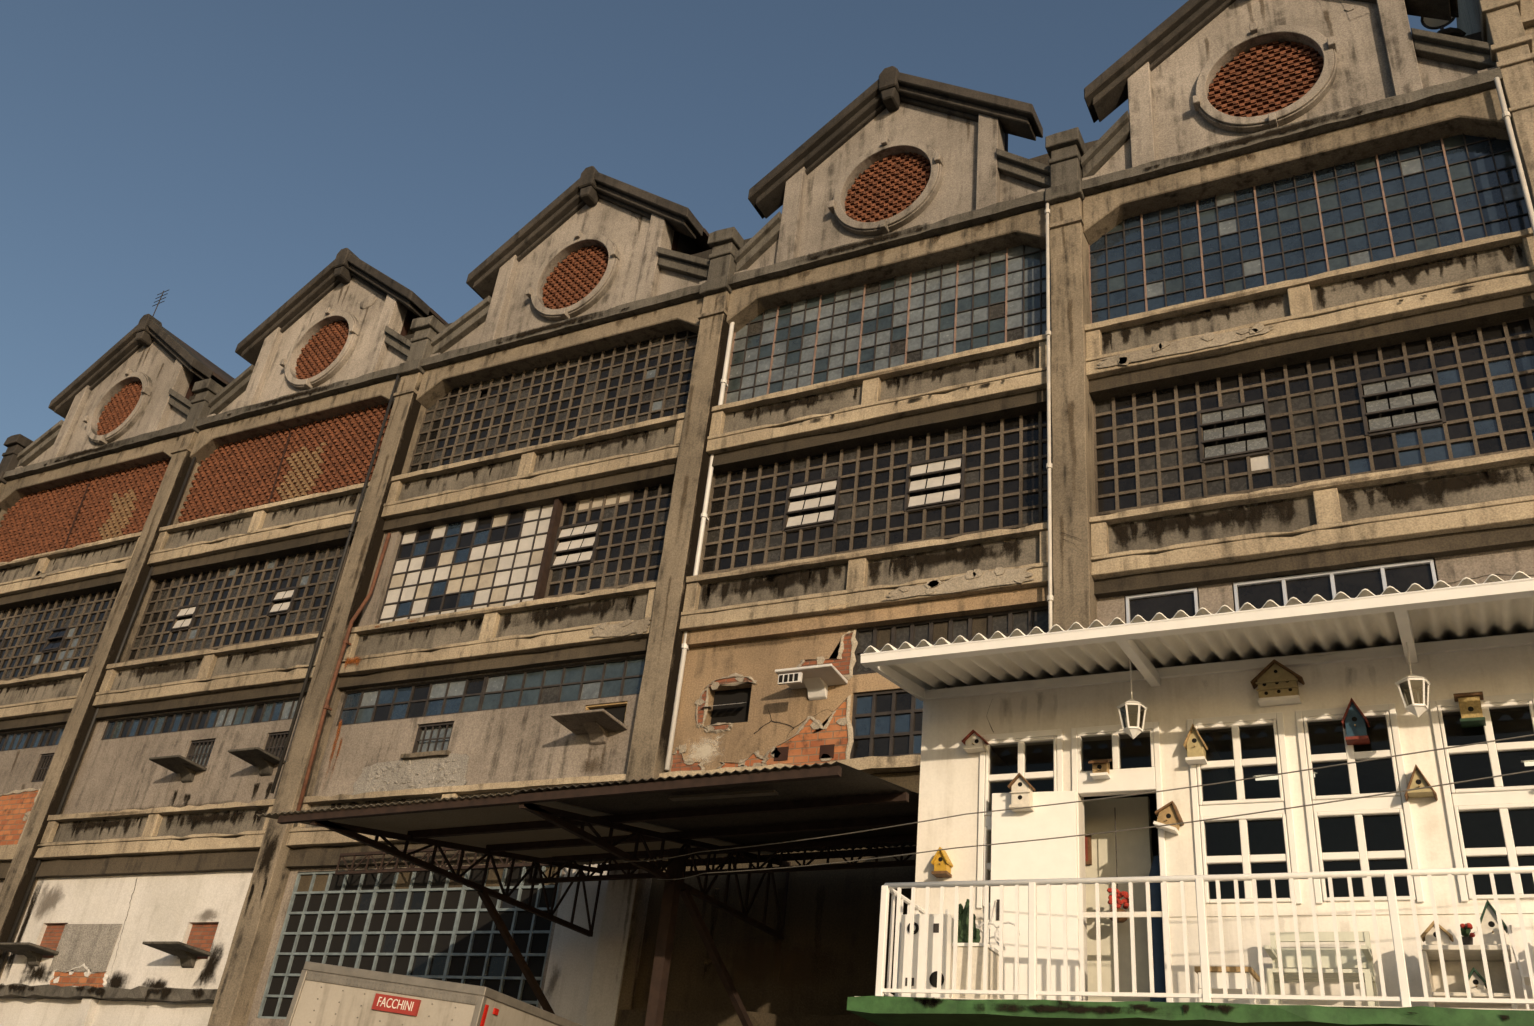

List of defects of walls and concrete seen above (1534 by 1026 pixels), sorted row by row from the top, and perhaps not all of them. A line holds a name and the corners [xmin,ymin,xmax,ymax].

water stain [1342,464,1534,511]
water stain [1111,500,1294,547]
flaking render [667,629,858,772]
flaking render [0,788,40,845]